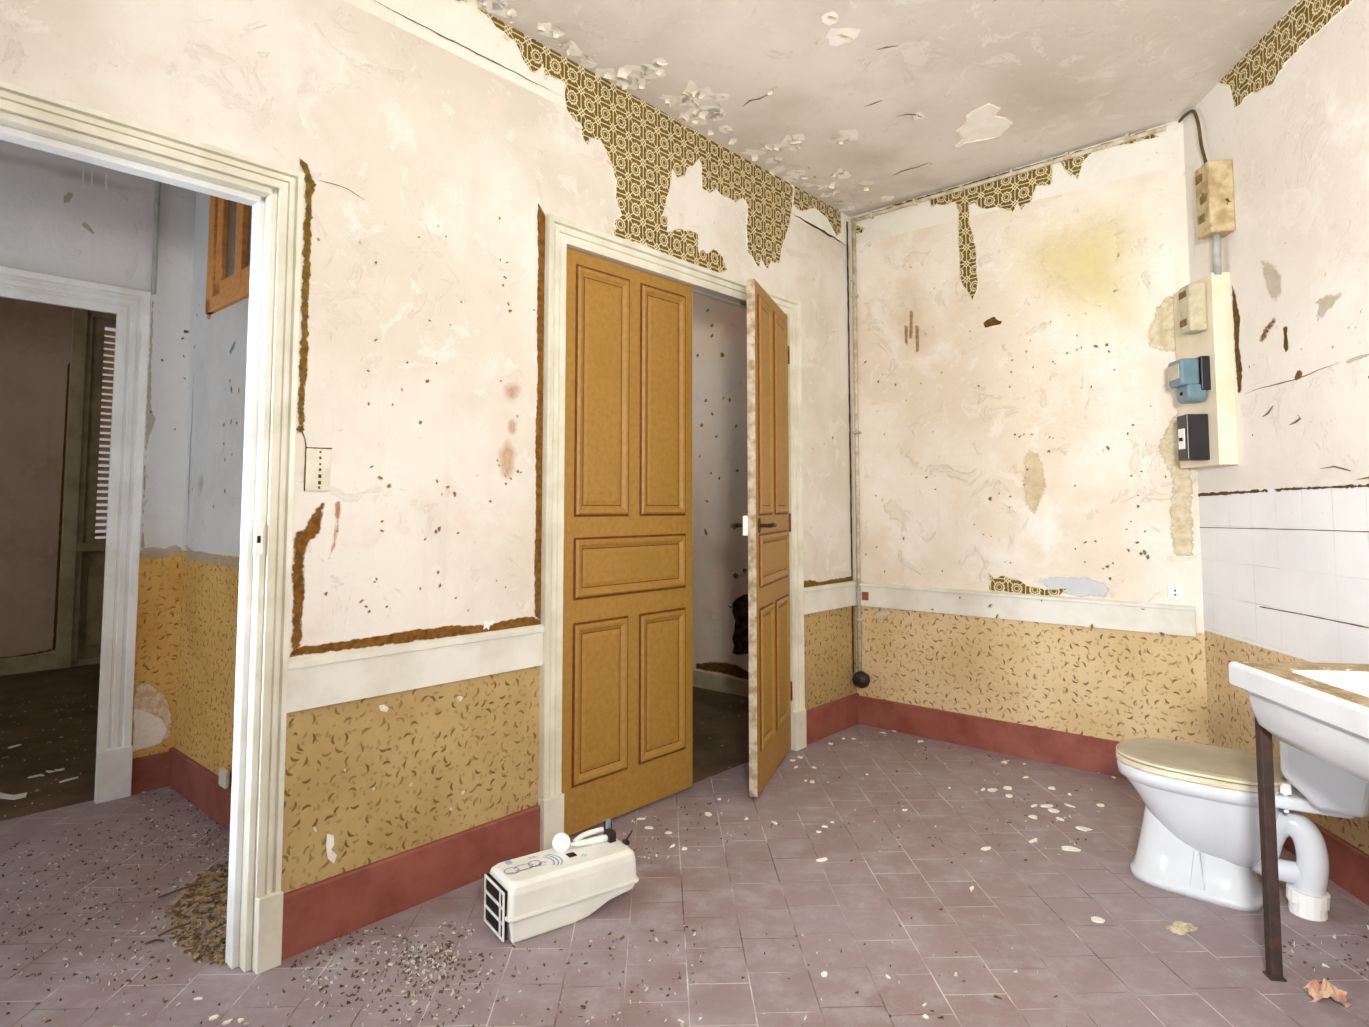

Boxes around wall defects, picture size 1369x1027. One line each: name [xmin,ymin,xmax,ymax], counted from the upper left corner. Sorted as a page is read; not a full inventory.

peeling [816,11,860,46]
peeling [536,22,895,211]
spalling [1232,287,1255,393]
crack [1245,364,1334,394]
flaking render [988,433,1054,511]
crack [1199,525,1369,533]
crack [1259,606,1368,628]
spalling [132,683,173,752]